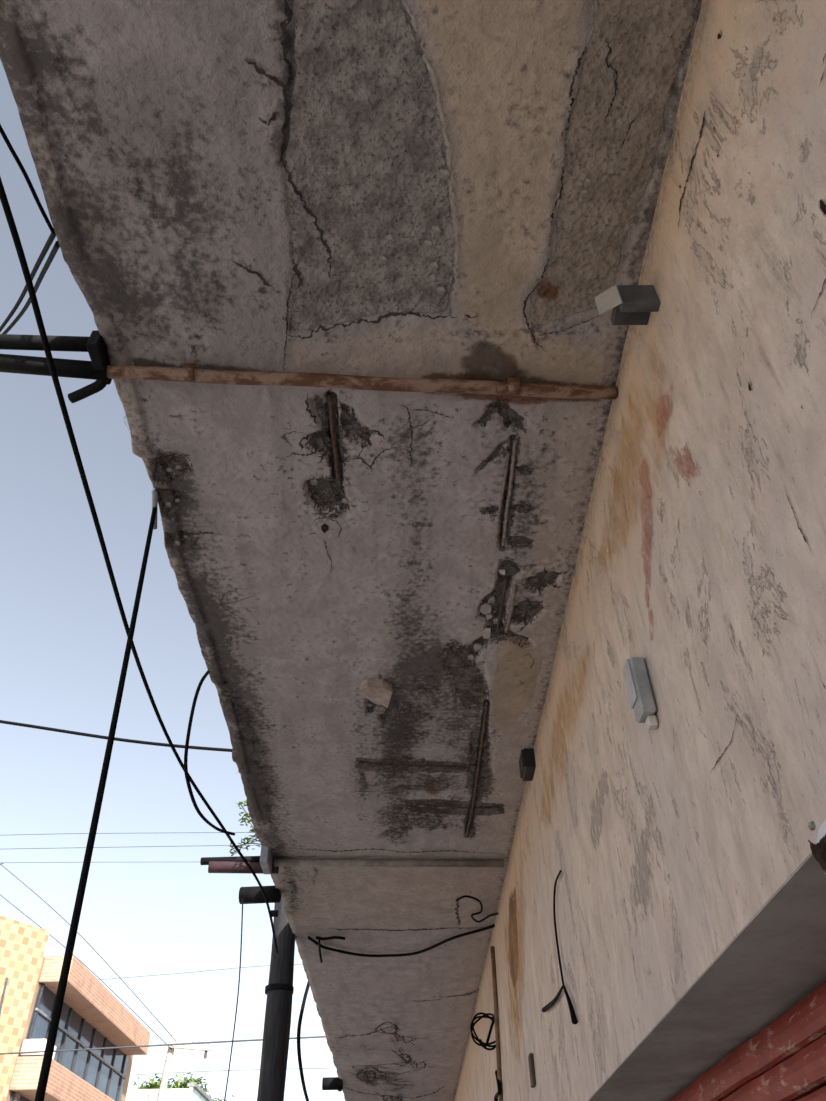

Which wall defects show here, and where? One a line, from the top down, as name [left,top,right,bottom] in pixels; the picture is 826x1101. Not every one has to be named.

crack [562,39,638,149]
crack [232,0,478,366]
crack [523,167,599,351]
spalling [299,389,385,519]
rust [106,365,618,419]
damp [463,343,563,385]
spalling [353,399,569,838]
damp [215,659,279,827]
damp [373,676,457,840]
crack [339,1021,444,1101]